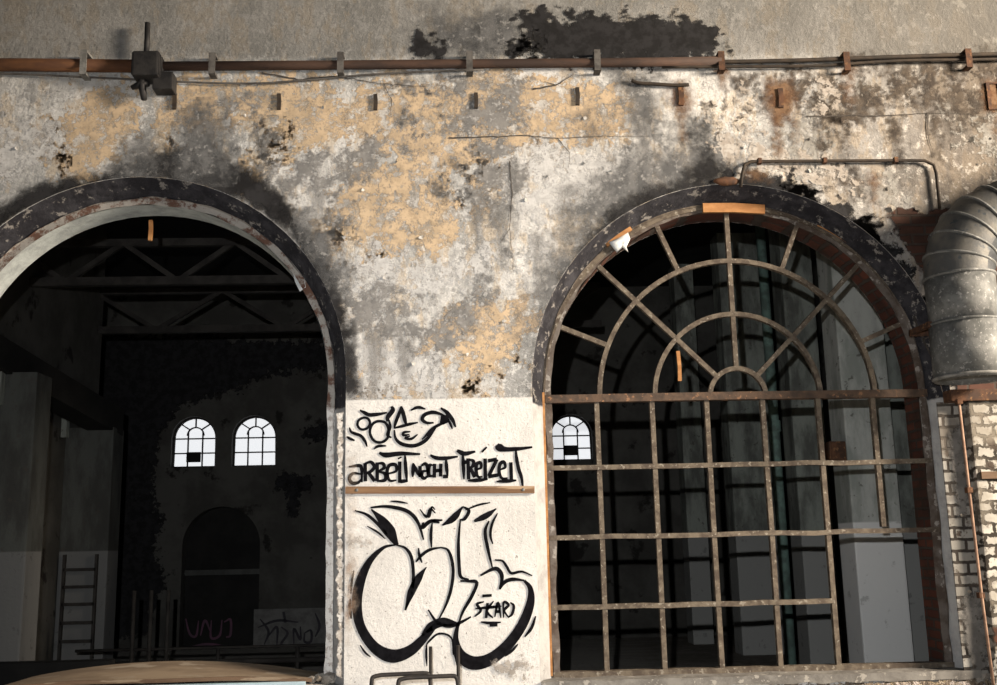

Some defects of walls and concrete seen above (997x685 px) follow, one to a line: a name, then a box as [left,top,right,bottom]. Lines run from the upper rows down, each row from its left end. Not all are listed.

damp [113,137,155,179]
corrosion [767,79,797,150]
damp [731,46,997,166]
peeling [0,60,670,400]
flaking render [948,425,972,518]
flaking render [777,590,997,685]